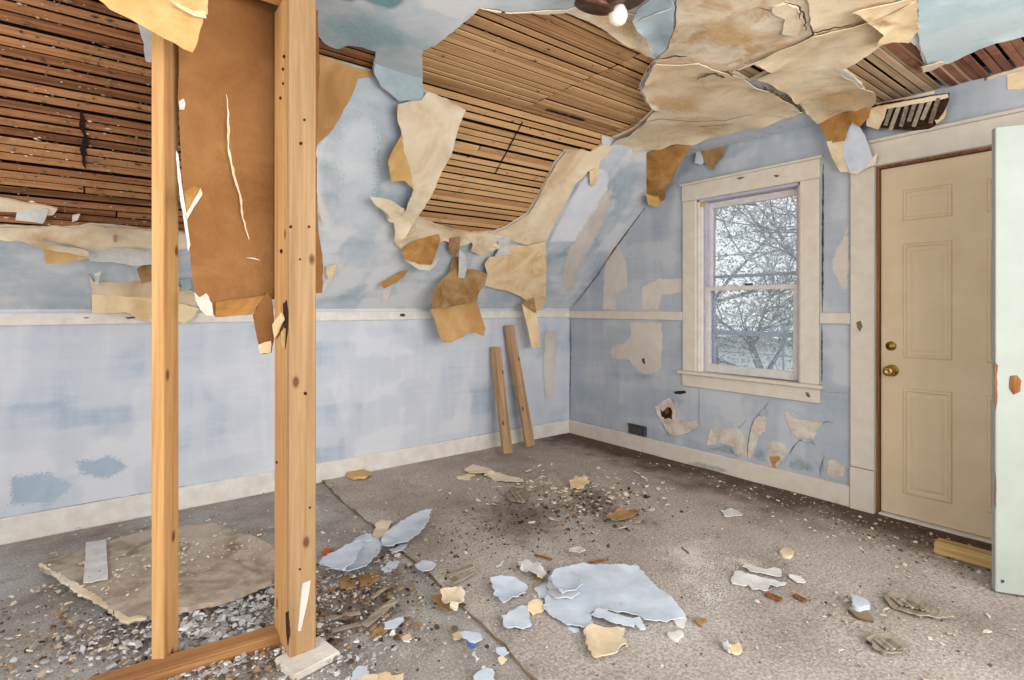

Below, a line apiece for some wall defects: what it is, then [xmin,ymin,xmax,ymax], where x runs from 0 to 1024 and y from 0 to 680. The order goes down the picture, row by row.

flaking render [479,0,919,73]
flaking render [1007,71,1024,90]
flaking render [316,54,372,227]
peeling [370,92,612,249]
spalling [0,225,152,298]
flaking render [178,277,199,307]
peeling [322,262,345,293]
peeling [655,391,789,467]
peeling [785,411,823,442]
peeling [824,460,844,477]